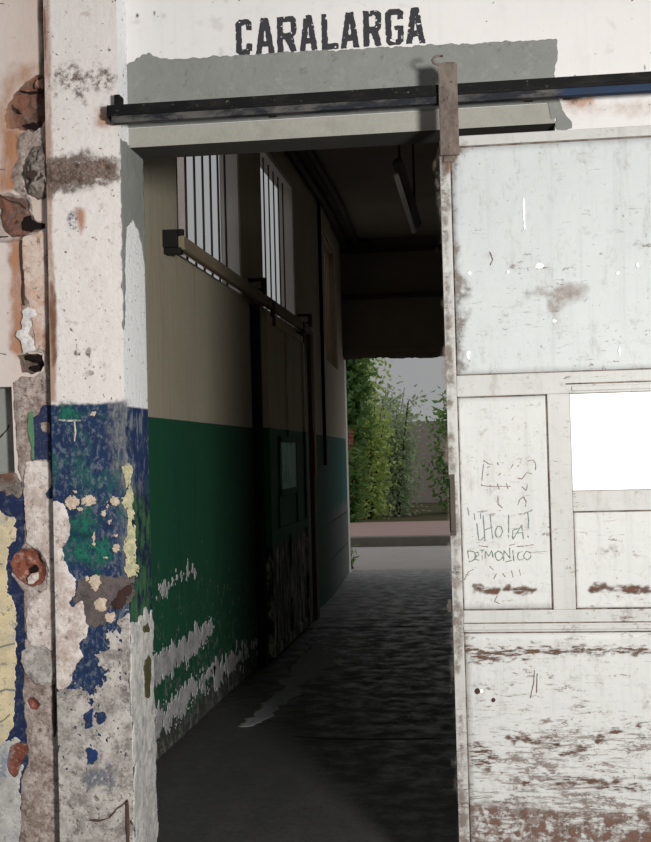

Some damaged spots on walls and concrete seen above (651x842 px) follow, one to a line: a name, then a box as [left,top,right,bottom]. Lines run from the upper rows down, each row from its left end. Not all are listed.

peeling [0,75,258,842]